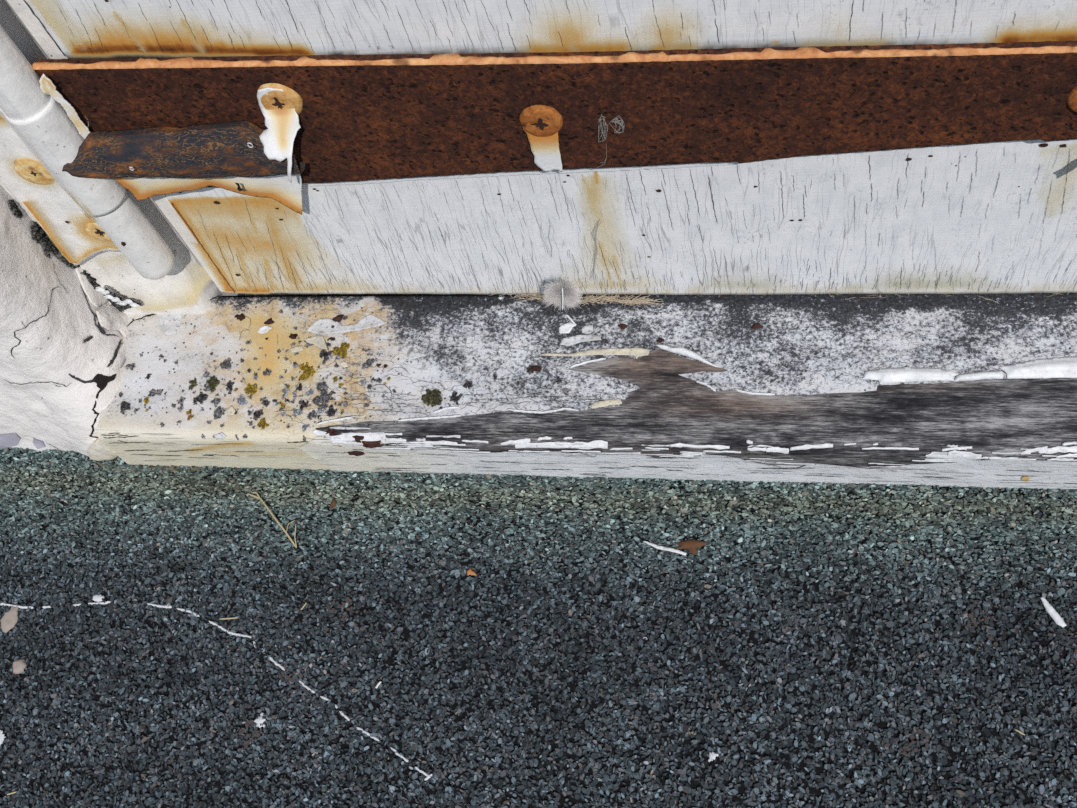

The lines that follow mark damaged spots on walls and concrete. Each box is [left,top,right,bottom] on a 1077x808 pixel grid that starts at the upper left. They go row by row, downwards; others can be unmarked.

corrosion [31,0,315,57]
corrosion [527,21,632,53]
corrosion [649,25,694,50]
corrosion [991,26,1077,43]
peeling [39,74,306,215]
corrosion [22,193,126,264]
corrosion [143,192,329,311]
crack [5,261,246,461]
spalling [0,314,1077,808]